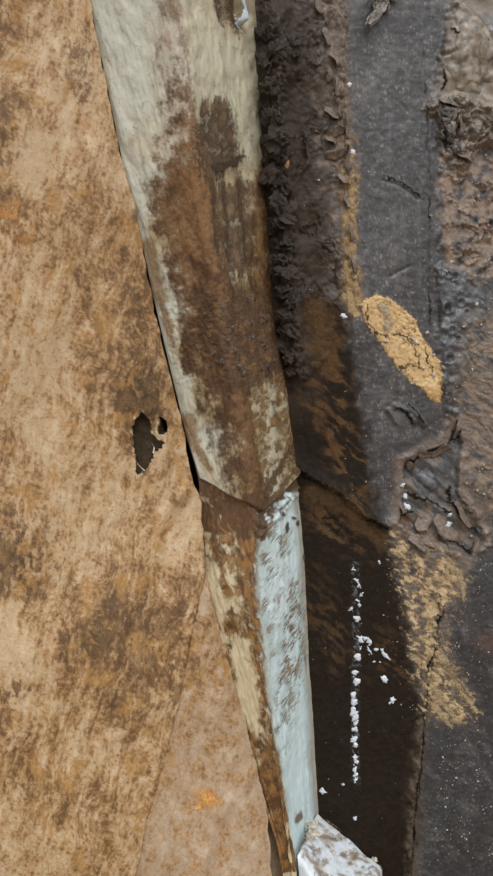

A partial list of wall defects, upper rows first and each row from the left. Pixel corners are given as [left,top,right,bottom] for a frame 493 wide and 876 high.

corrosion [143,50,301,873]
water stain [341,636,391,786]
water stain [304,484,483,727]
crack [411,571,445,875]